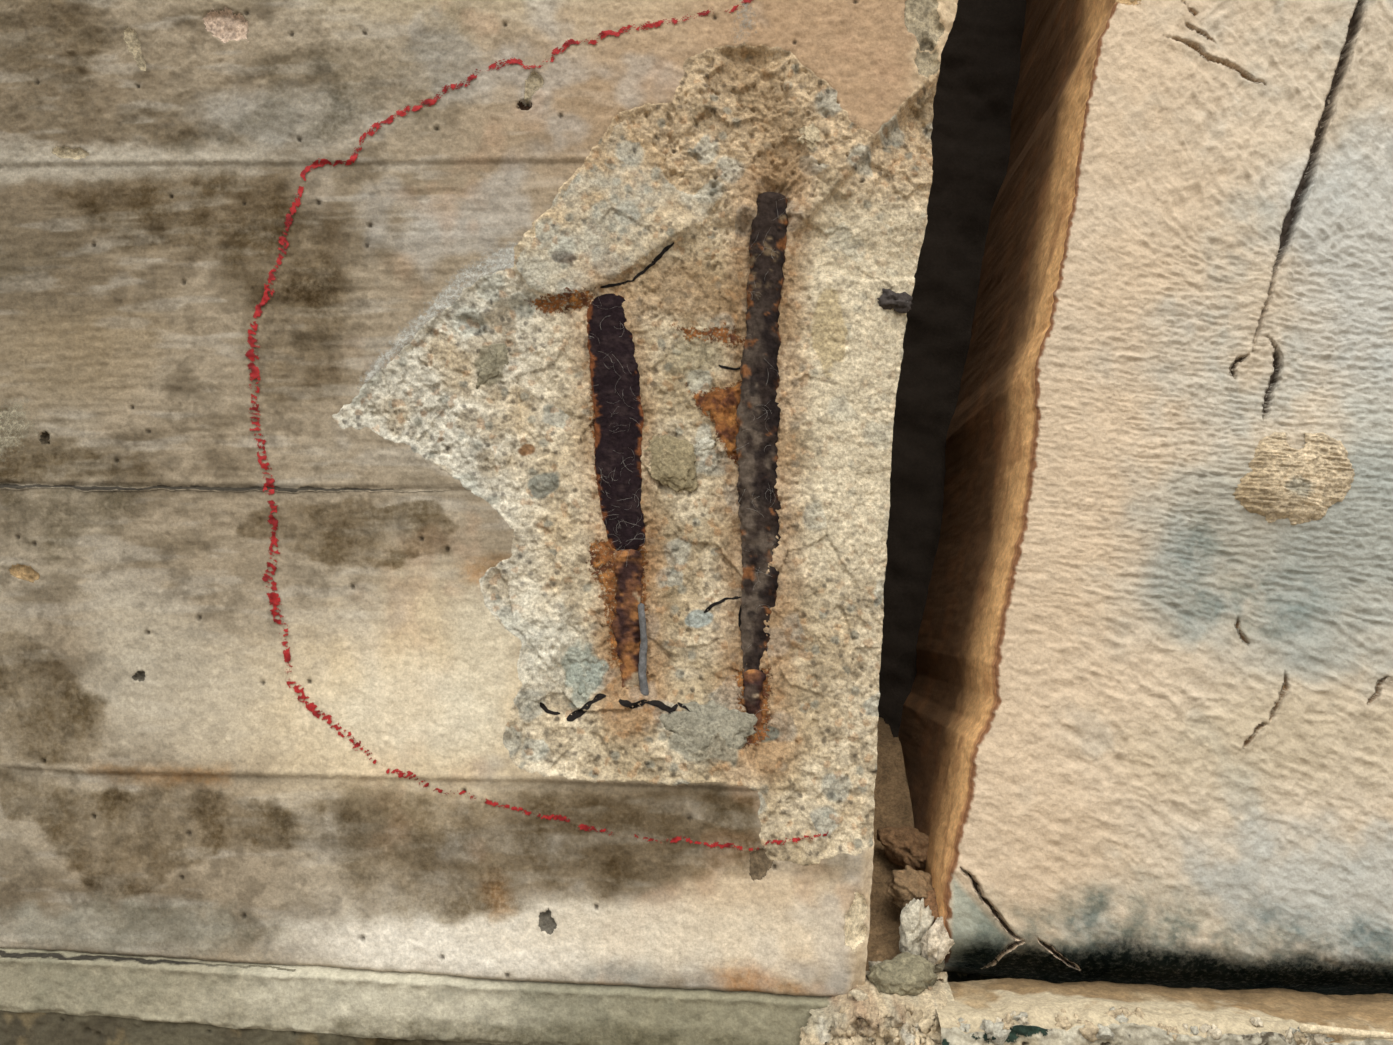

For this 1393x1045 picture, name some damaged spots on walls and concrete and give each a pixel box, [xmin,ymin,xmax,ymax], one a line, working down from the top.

crack [1164,0,1267,85]
crack [1229,0,1368,421]
damp [360,243,515,382]
damp [0,404,32,452]
spalling [332,0,945,881]
rust [586,537,623,671]
rust [735,665,774,749]
crack [959,866,1081,971]